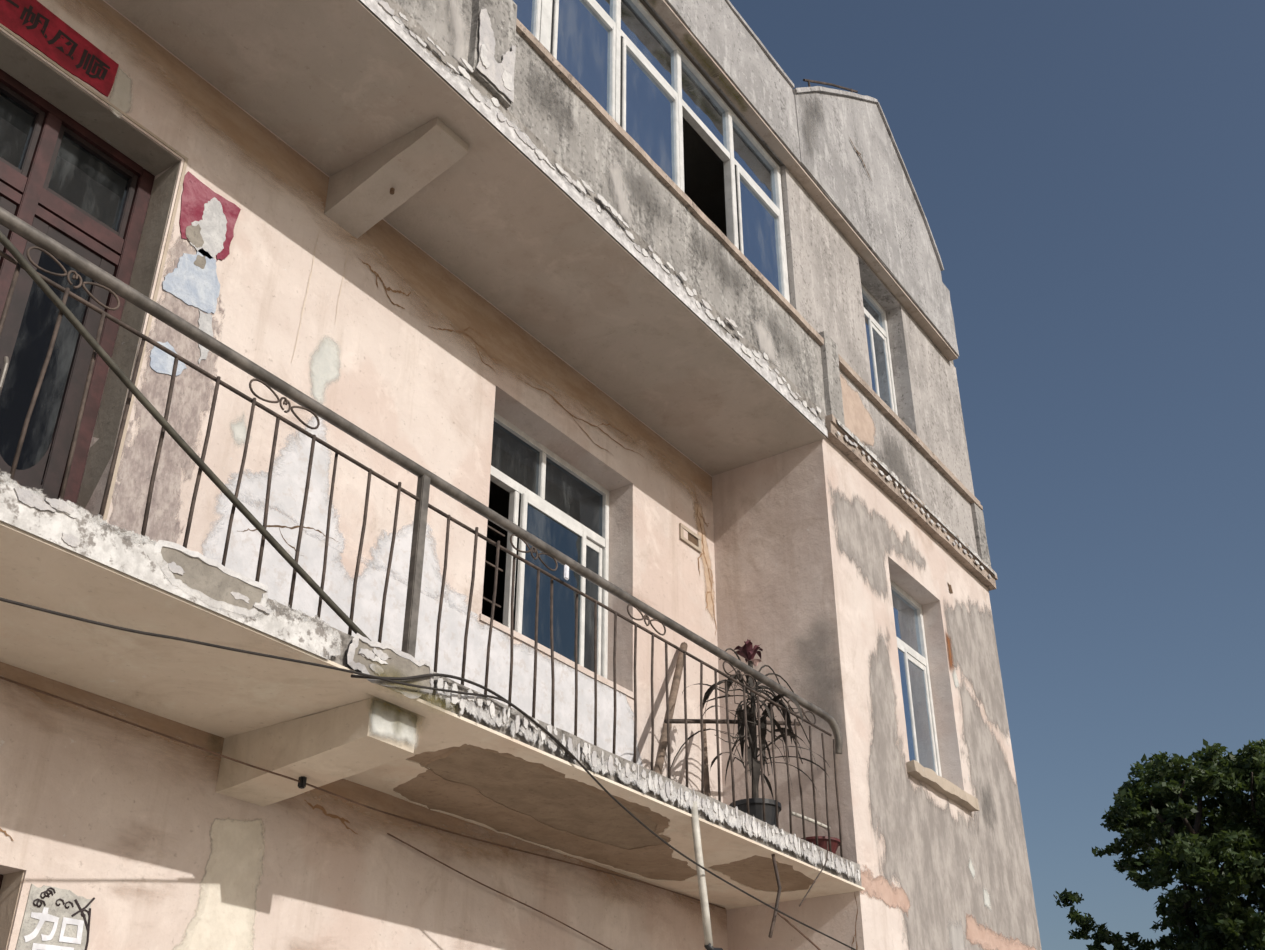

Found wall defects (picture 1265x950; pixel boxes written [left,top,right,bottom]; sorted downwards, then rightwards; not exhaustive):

water stain [450,0,468,64]
water stain [76,0,329,210]
crack [291,229,320,363]
crack [335,247,411,322]
water stain [351,219,712,495]
crack [429,326,641,455]
peeling [361,0,996,579]
water stain [754,322,779,366]
peeling [830,487,925,600]
peeling [0,337,860,893]
peeling [868,583,1042,950]
peeling [173,819,265,950]